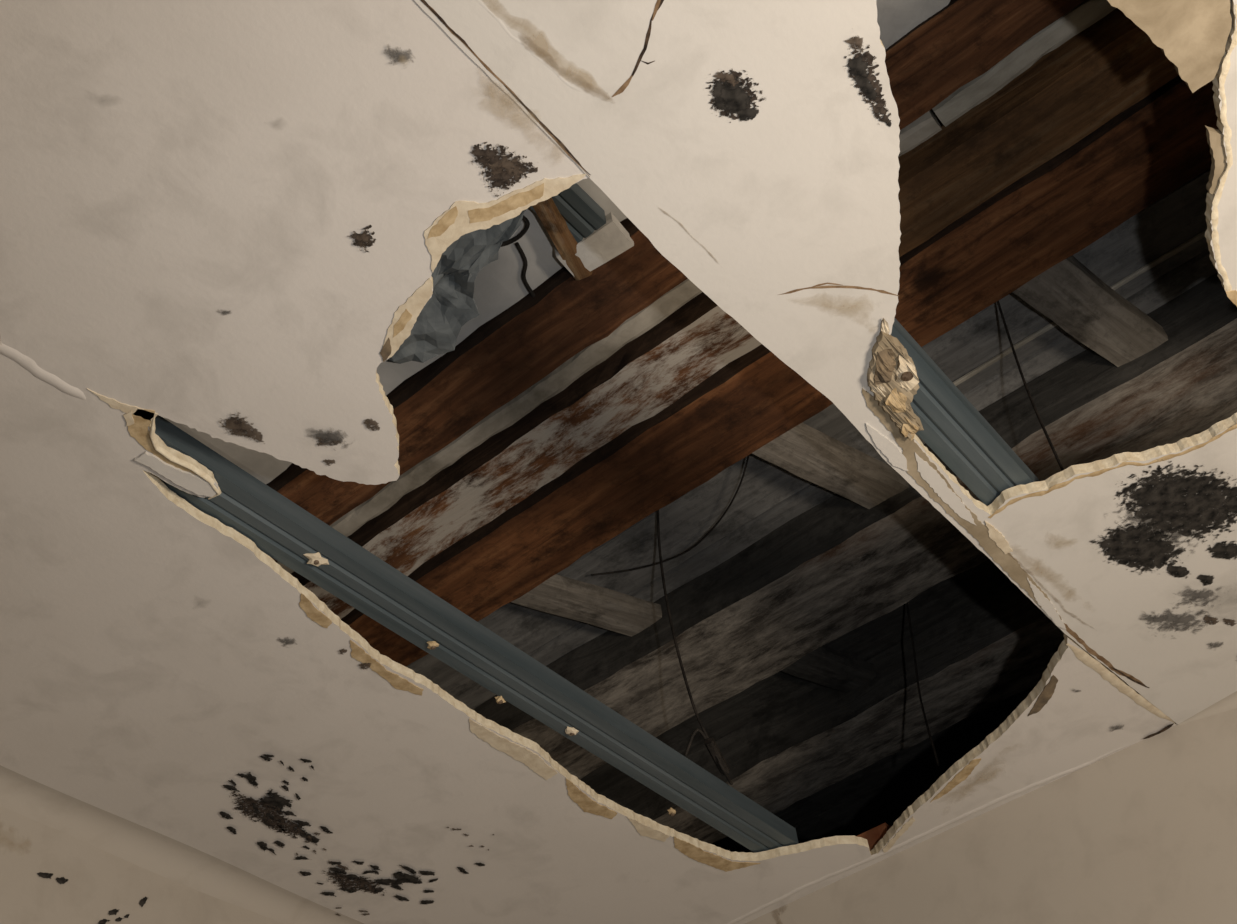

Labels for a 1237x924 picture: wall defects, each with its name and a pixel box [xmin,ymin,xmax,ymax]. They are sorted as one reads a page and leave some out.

crack [421,0,590,177]
crack [612,0,664,97]
damp [706,69,765,123]
damp [843,36,892,127]
damp [470,142,538,197]
damp [1090,461,1237,633]
damp [37,872,68,884]
damp [99,897,147,924]
damp [220,754,438,916]
damp [447,827,494,874]